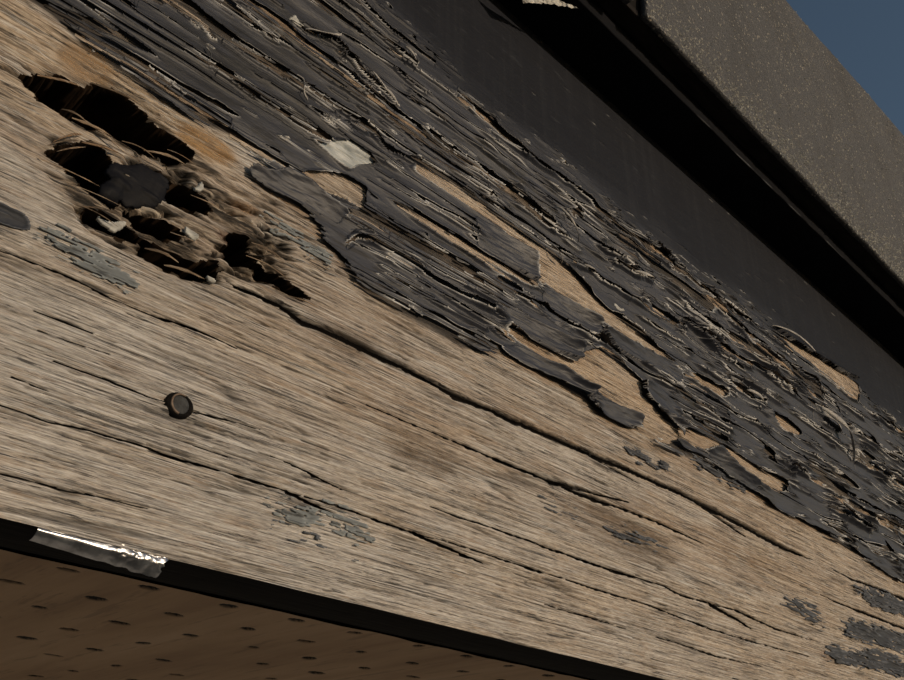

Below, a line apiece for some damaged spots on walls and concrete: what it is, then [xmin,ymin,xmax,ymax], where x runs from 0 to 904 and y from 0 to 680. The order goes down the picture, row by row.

peeling [46,0,119,32]
peeling [0,202,140,289]
peeling [250,139,785,494]
peeling [766,328,880,420]
crack [230,284,904,601]
peeling [775,414,800,435]
peeling [272,499,376,543]
crack [0,405,821,680]
peeling [780,596,822,623]
crack [820,594,904,630]
peeling [852,584,904,616]
peeling [824,617,904,678]